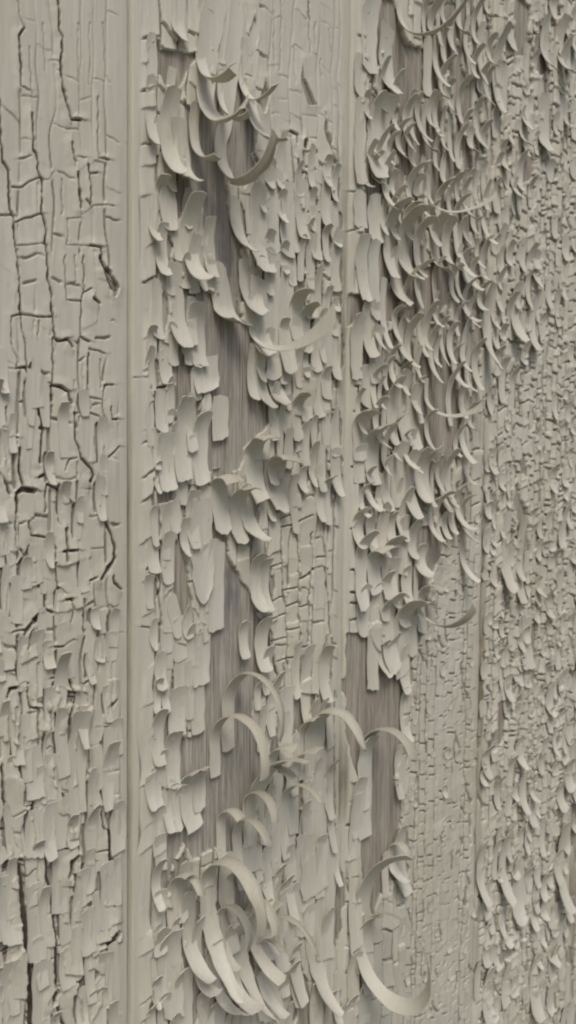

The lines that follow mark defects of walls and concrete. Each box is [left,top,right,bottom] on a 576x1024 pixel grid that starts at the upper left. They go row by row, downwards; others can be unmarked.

crack [16,29,24,87]
crack [57,0,79,122]
crack [0,114,121,647]
peeling [144,0,576,1024]
crack [7,667,76,749]
peeling [0,348,126,1024]
crack [0,766,33,830]
crack [0,812,111,1024]
crack [106,933,118,946]